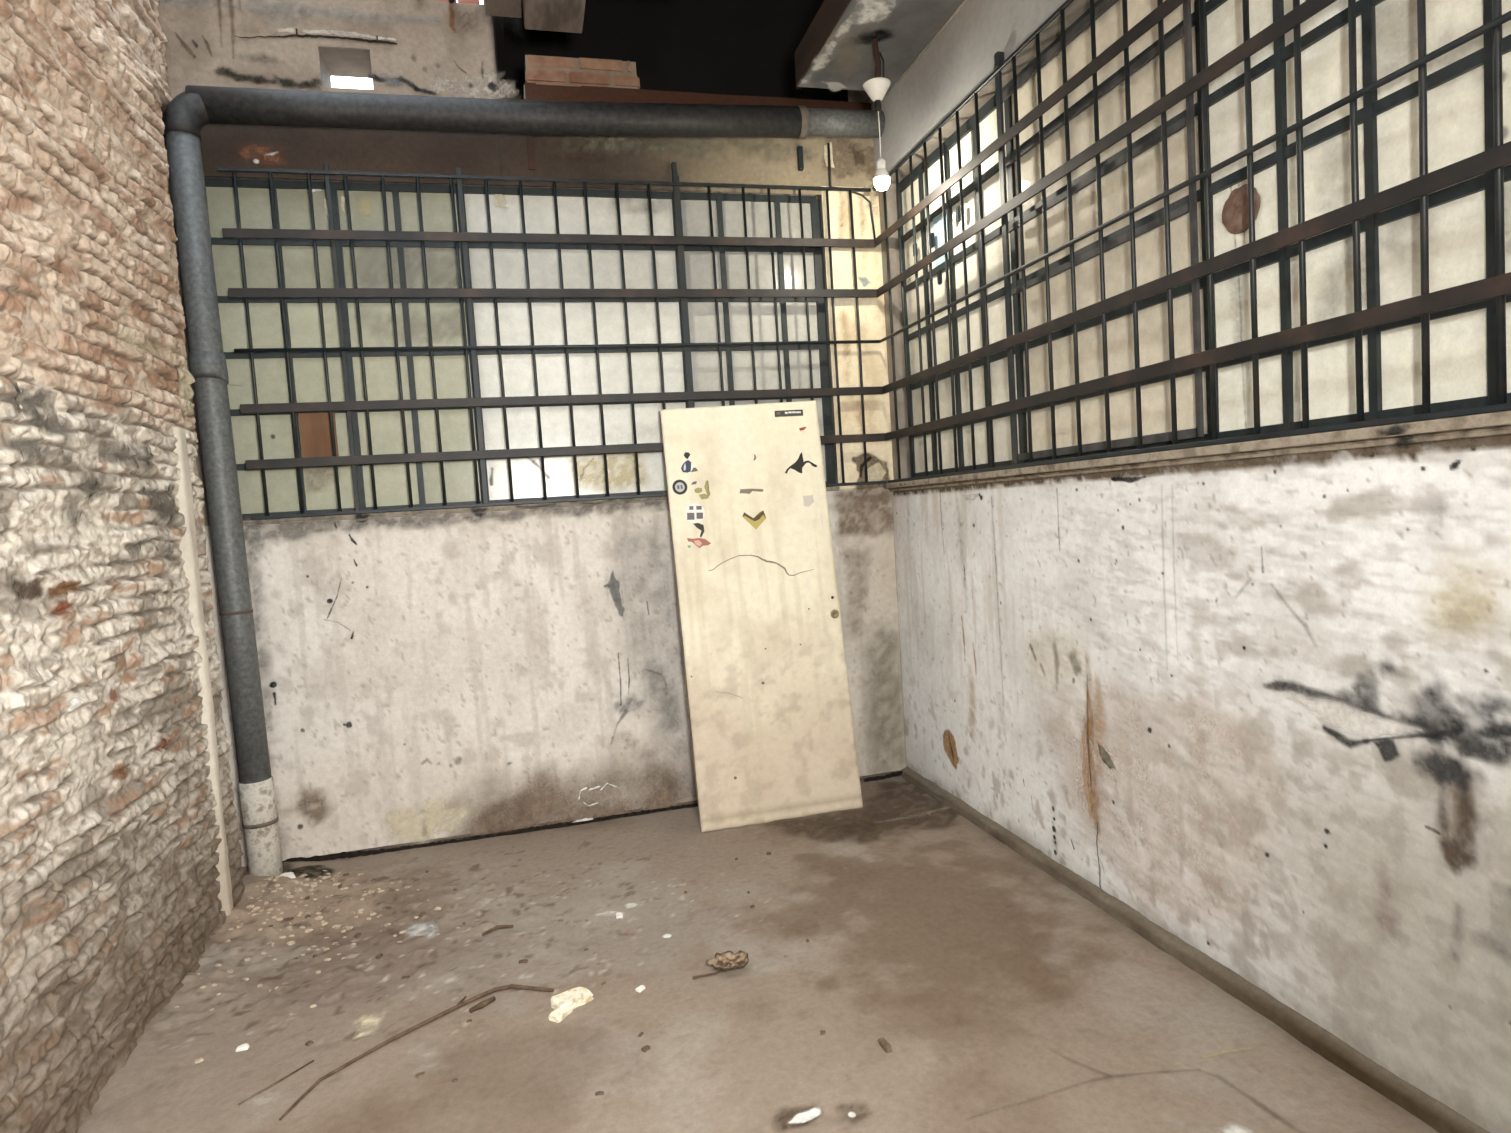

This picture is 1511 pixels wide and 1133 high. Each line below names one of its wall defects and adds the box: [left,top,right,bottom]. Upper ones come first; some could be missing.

flaking render [803,0,894,89]
corrosion [943,730,958,768]
corrosion [1082,689,1100,830]